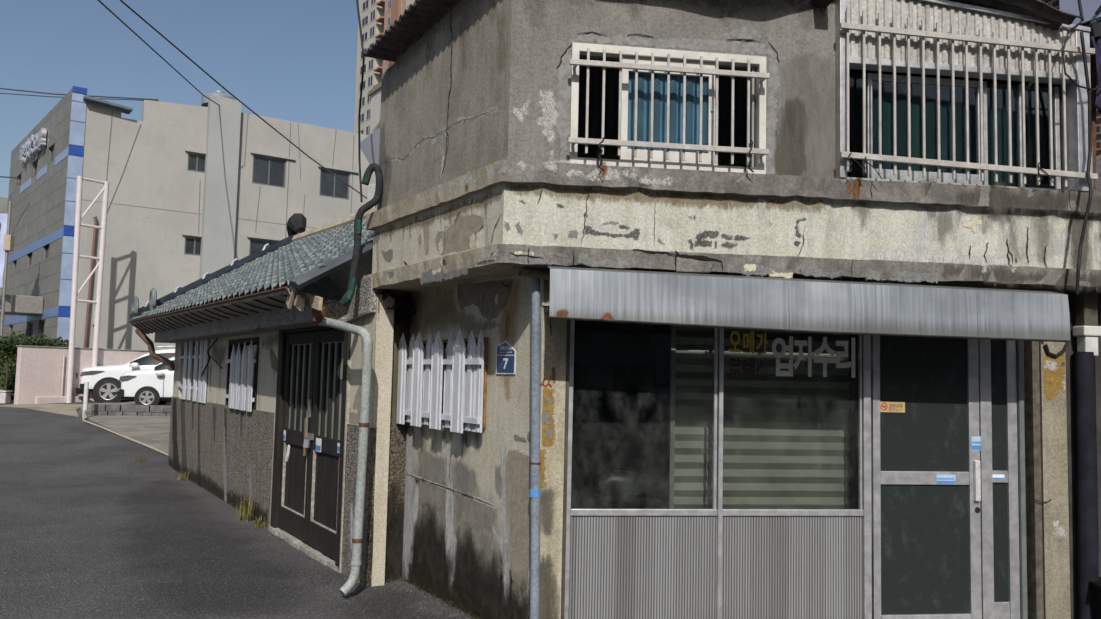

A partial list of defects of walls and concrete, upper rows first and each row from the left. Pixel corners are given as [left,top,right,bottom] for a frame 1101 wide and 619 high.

crack [383,4,505,181]
peeling [554,212,640,240]
peeling [688,230,749,249]
peeling [418,211,514,321]
peeling [508,251,611,267]
peeling [726,263,843,278]
peeling [865,269,939,284]
damp [368,424,558,619]